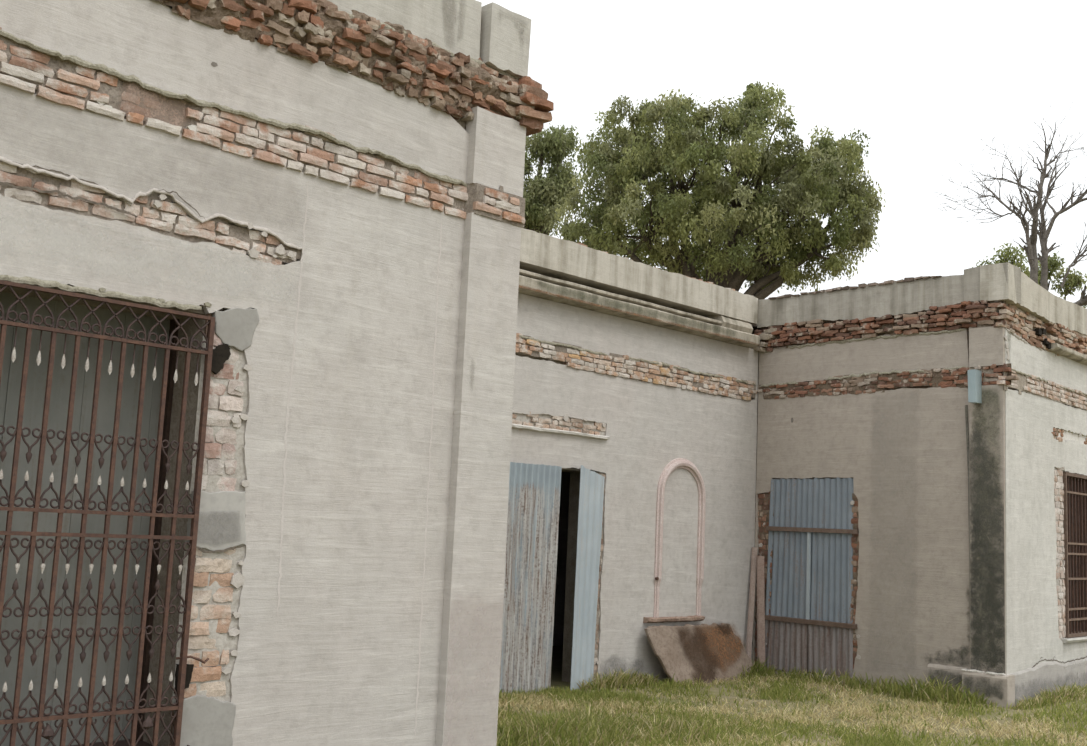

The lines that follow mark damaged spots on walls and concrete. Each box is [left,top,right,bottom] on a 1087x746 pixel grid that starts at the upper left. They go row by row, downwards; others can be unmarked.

spalling [0,27,525,228]
flaking render [169,0,554,136]
spalling [0,156,303,265]
flaking render [201,331,248,491]
spalling [512,412,610,440]
spalling [515,333,1087,411]
flaking render [749,300,1087,356]
spalling [1051,428,1087,445]
flaking render [175,546,245,698]
damp [929,430,1085,700]
crack [1032,656,1087,668]
flaking render [1054,467,1066,638]